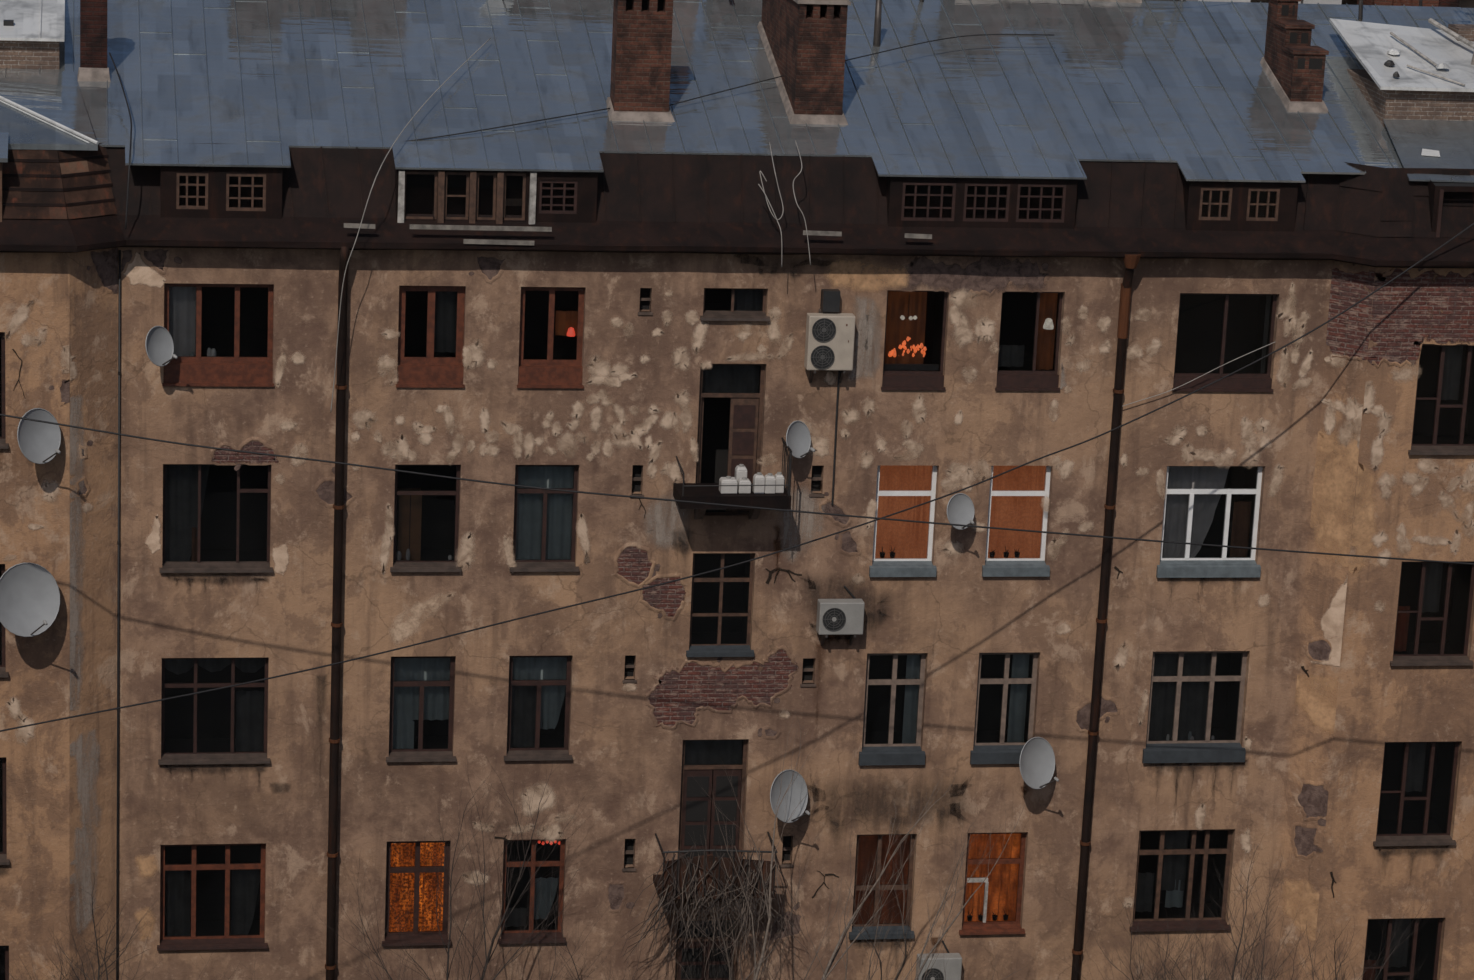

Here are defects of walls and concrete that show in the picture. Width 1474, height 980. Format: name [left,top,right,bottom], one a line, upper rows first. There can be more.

peeling [275,352,304,387]
flaking render [1277,264,1474,565]
flaking render [209,421,306,483]
peeling [380,503,394,574]
peeling [458,532,474,569]
peeling [504,535,516,567]
peeling [577,513,590,564]
flaking render [613,542,688,622]
peeling [7,698,35,742]
flaking render [623,645,800,740]
peeling [510,783,575,841]
spalling [1290,780,1329,860]